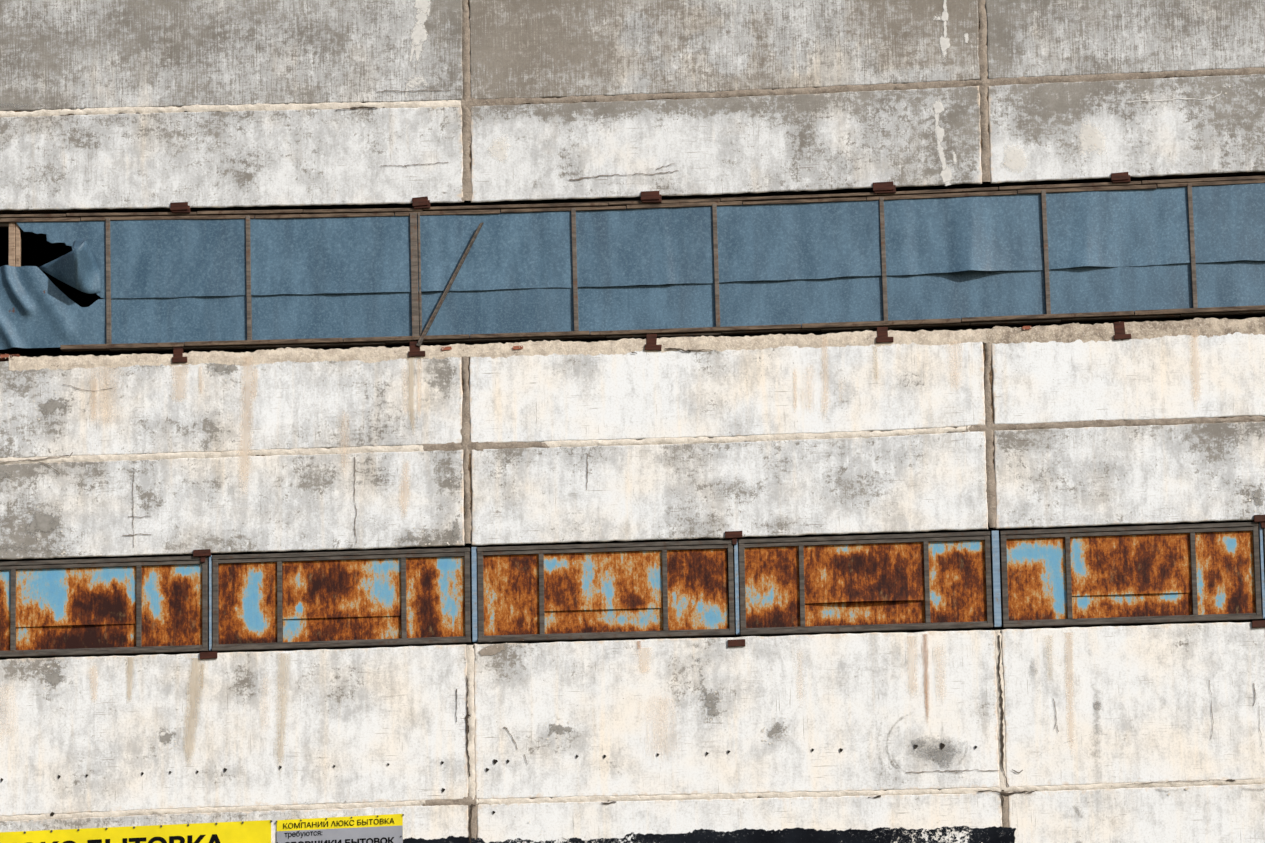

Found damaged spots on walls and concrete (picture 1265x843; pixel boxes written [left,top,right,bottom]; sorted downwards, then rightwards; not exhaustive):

water stain [933,0,950,58]
water stain [933,97,957,186]